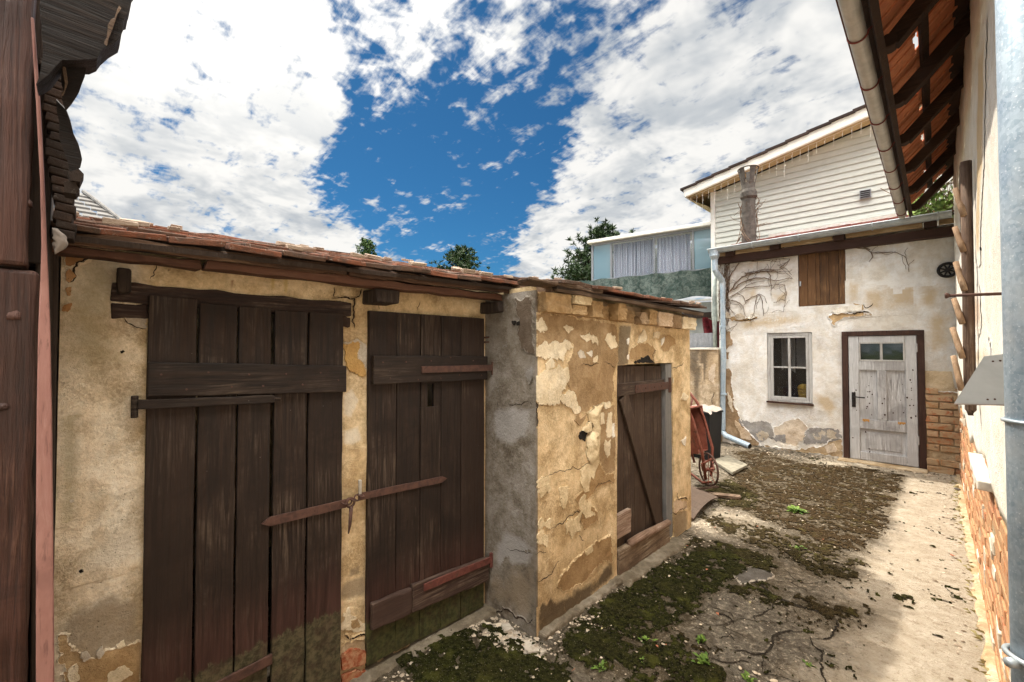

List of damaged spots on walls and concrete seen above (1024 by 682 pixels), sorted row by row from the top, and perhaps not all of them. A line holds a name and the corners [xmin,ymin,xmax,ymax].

flaking render [827,303,875,328]
flaking render [343,337,367,377]
flaking render [707,277,866,457]
flaking render [511,295,676,539]
flaking render [537,517,552,547]
crack [507,511,583,582]
flaking render [556,534,614,592]
flaking render [672,493,688,515]
flaking render [55,632,141,682]
flaking render [340,607,366,682]
crack [709,581,839,682]